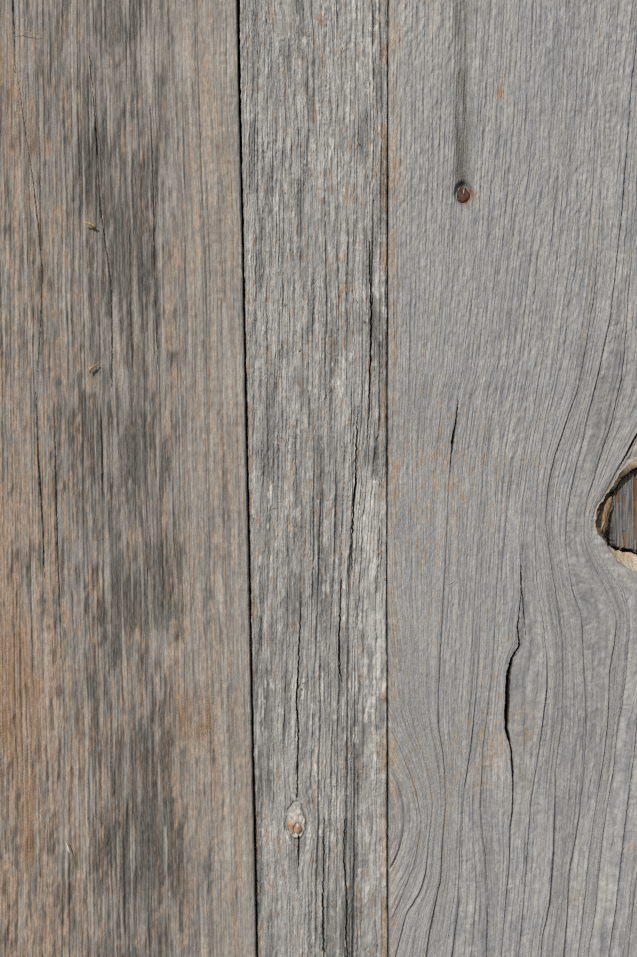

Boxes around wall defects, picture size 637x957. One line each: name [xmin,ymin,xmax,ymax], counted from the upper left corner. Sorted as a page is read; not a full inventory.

crack [504,565,526,791]